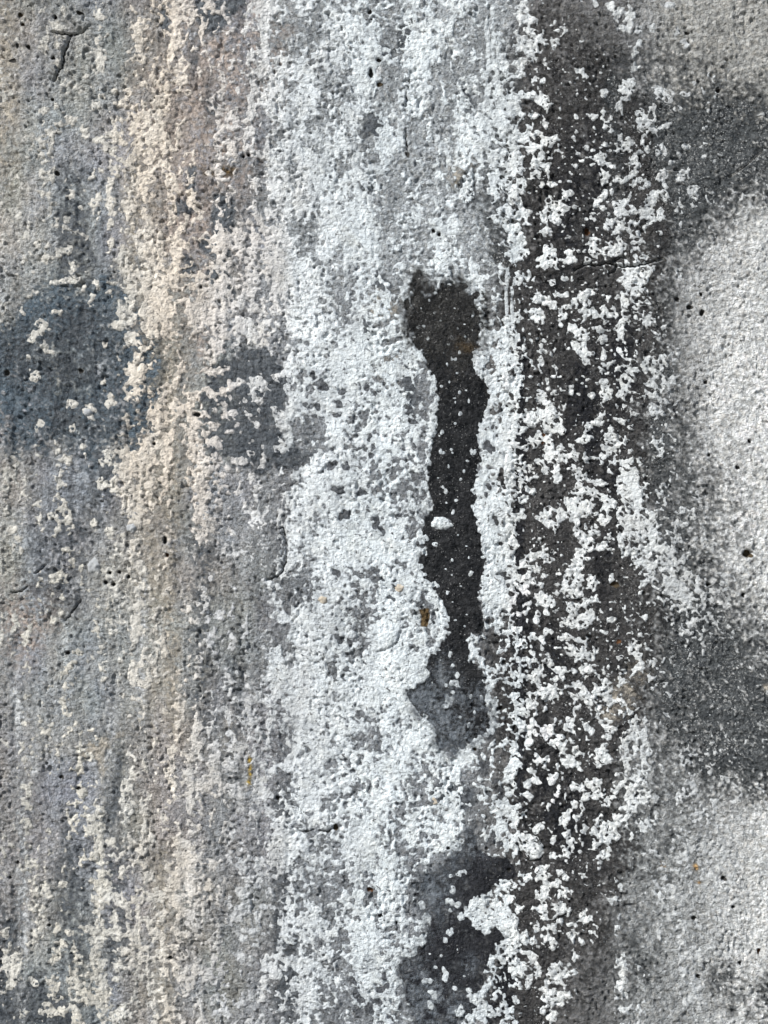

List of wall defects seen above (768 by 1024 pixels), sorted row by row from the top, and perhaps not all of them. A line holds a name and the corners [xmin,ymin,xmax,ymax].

peeling [674,26,690,50]
peeling [555,54,611,100]
peeling [692,72,721,114]
peeling [675,167,690,182]
peeling [696,184,768,270]
crack [576,256,660,274]
peeling [681,462,707,504]
peeling [442,651,461,709]
peeling [596,877,624,906]
peeling [628,723,765,1024]
peeling [421,954,457,1010]
peeling [614,952,650,1024]